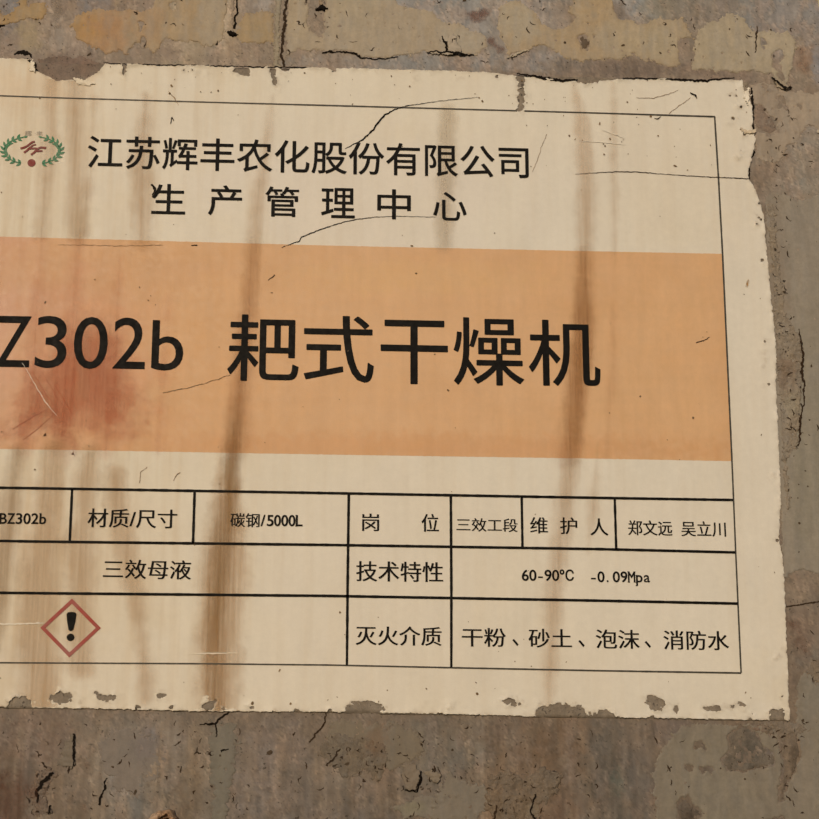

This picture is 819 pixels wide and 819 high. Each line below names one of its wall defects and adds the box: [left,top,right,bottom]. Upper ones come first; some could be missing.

peeling [38,0,228,64]
peeling [236,9,275,44]
peeling [285,0,488,59]
peeling [497,0,819,163]
peeling [765,191,819,578]
peeling [94,727,167,799]
crack [165,712,250,810]
peeling [206,719,242,819]
peeling [324,718,490,819]
crack [292,713,598,819]
peeling [650,672,819,819]
crack [762,720,809,814]